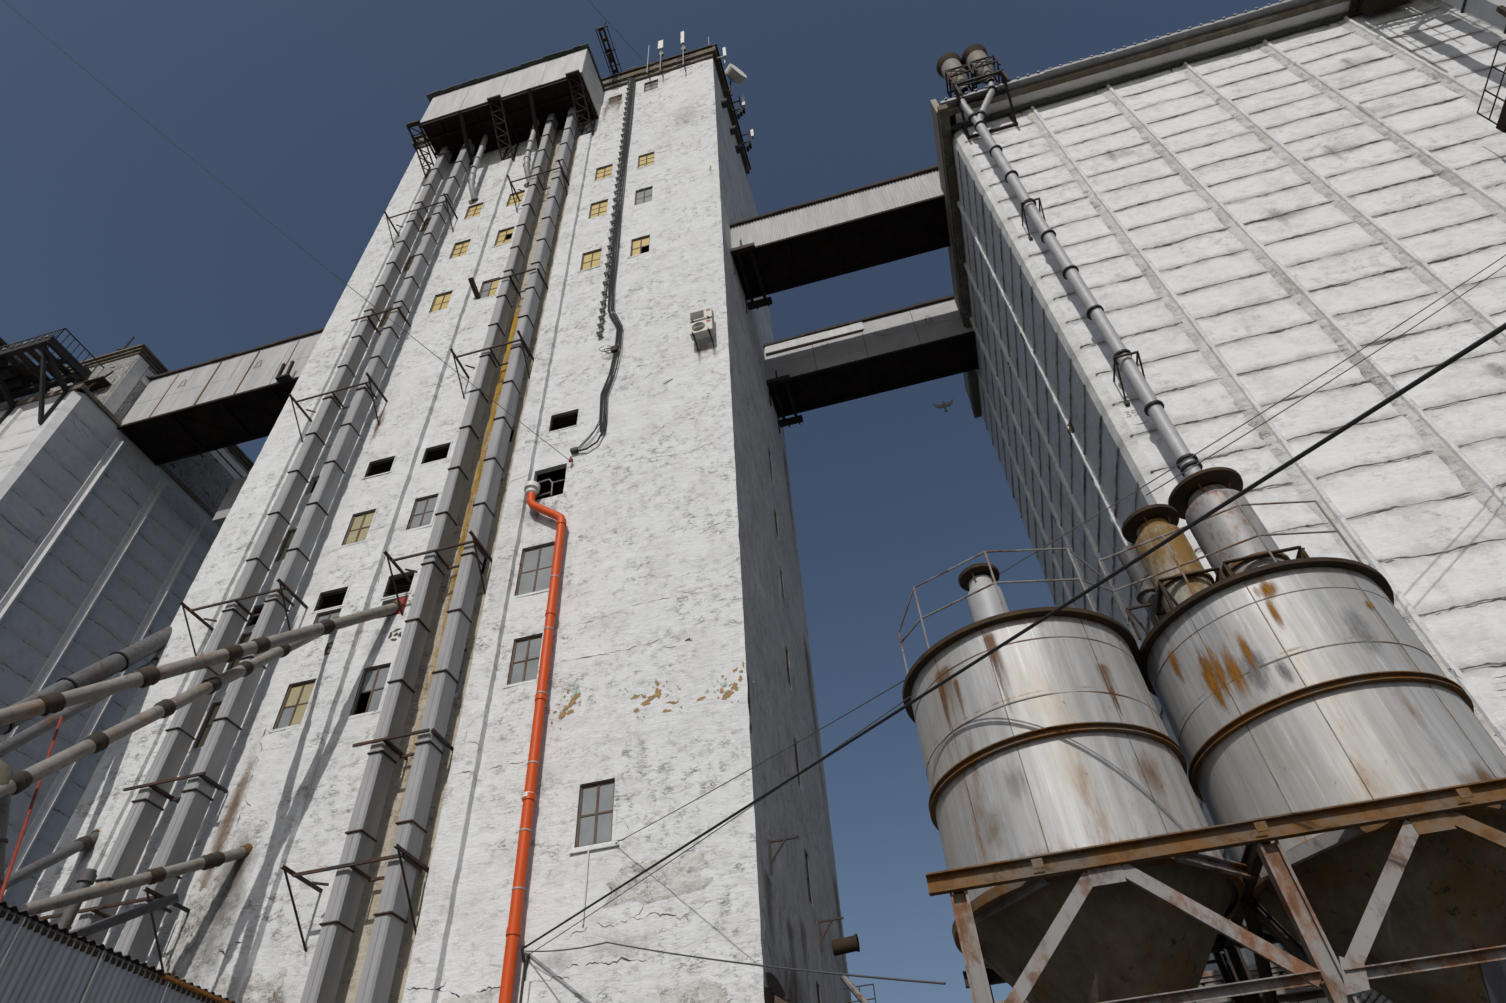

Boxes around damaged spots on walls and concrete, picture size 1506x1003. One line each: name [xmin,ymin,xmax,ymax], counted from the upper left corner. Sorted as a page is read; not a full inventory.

corrosion [1261,581,1282,623]
peeling [551,683,587,729]
peeling [619,661,754,733]
corrosion [1169,653,1183,680]
corrosion [1201,638,1253,704]
corrosion [215,783,243,852]